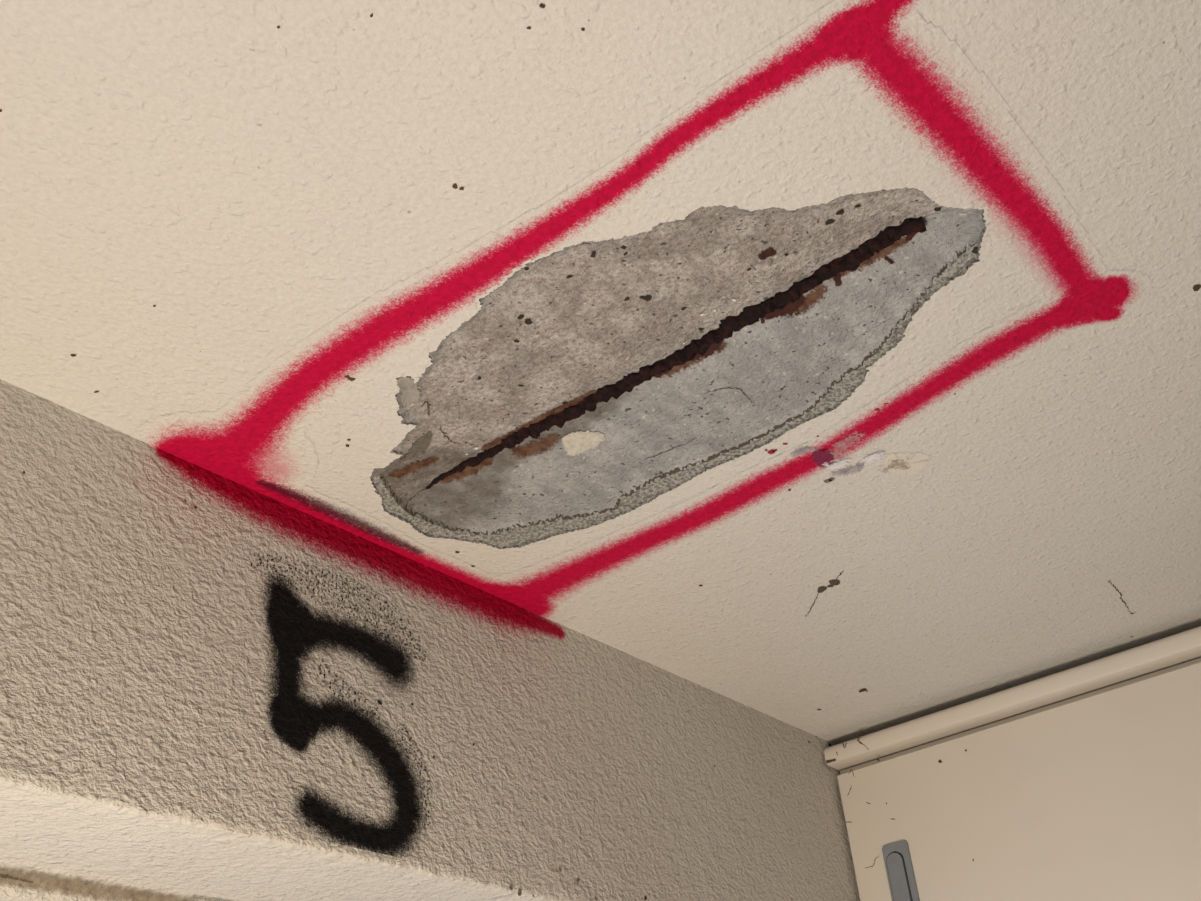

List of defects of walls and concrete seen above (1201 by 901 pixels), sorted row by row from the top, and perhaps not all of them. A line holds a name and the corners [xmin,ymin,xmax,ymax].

corrosion [757,248,776,260]
corrosion [760,232,918,324]
spalling [370,187,986,553]
corrosion [655,339,727,378]
corrosion [389,457,439,479]
corrosion [440,390,597,484]